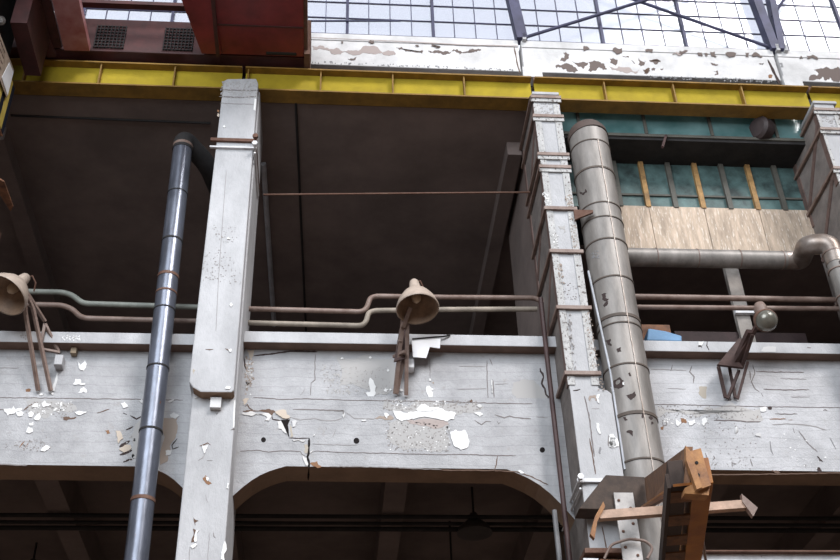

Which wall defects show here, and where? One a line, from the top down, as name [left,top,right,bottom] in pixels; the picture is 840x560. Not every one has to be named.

peeling [312,40,513,71]
peeling [556,47,773,83]
peeling [800,55,840,82]
crack [216,177,226,325]
peeling [4,373,87,452]
peeling [73,361,87,393]
crack [206,348,372,480]
peeling [320,355,483,452]